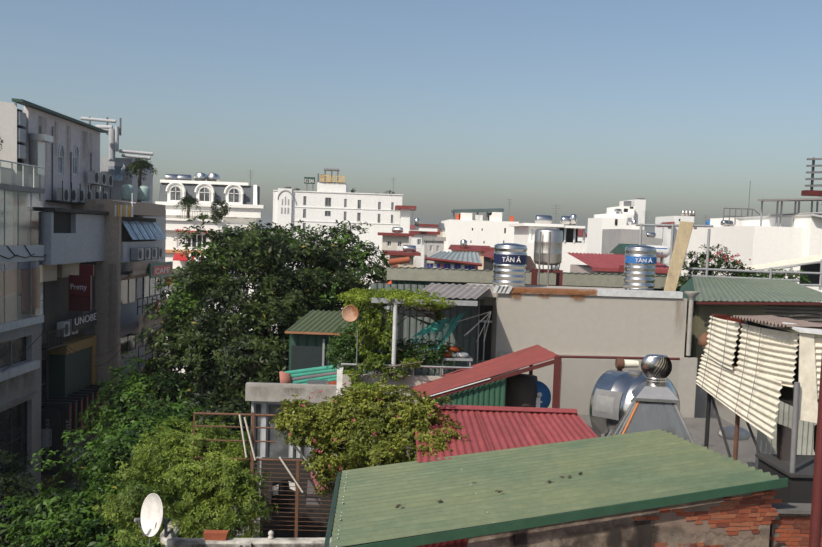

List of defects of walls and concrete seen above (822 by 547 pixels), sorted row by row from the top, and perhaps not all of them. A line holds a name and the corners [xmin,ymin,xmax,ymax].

spalling [633,491,811,547]
damp [511,529,528,547]
damp [608,521,684,547]